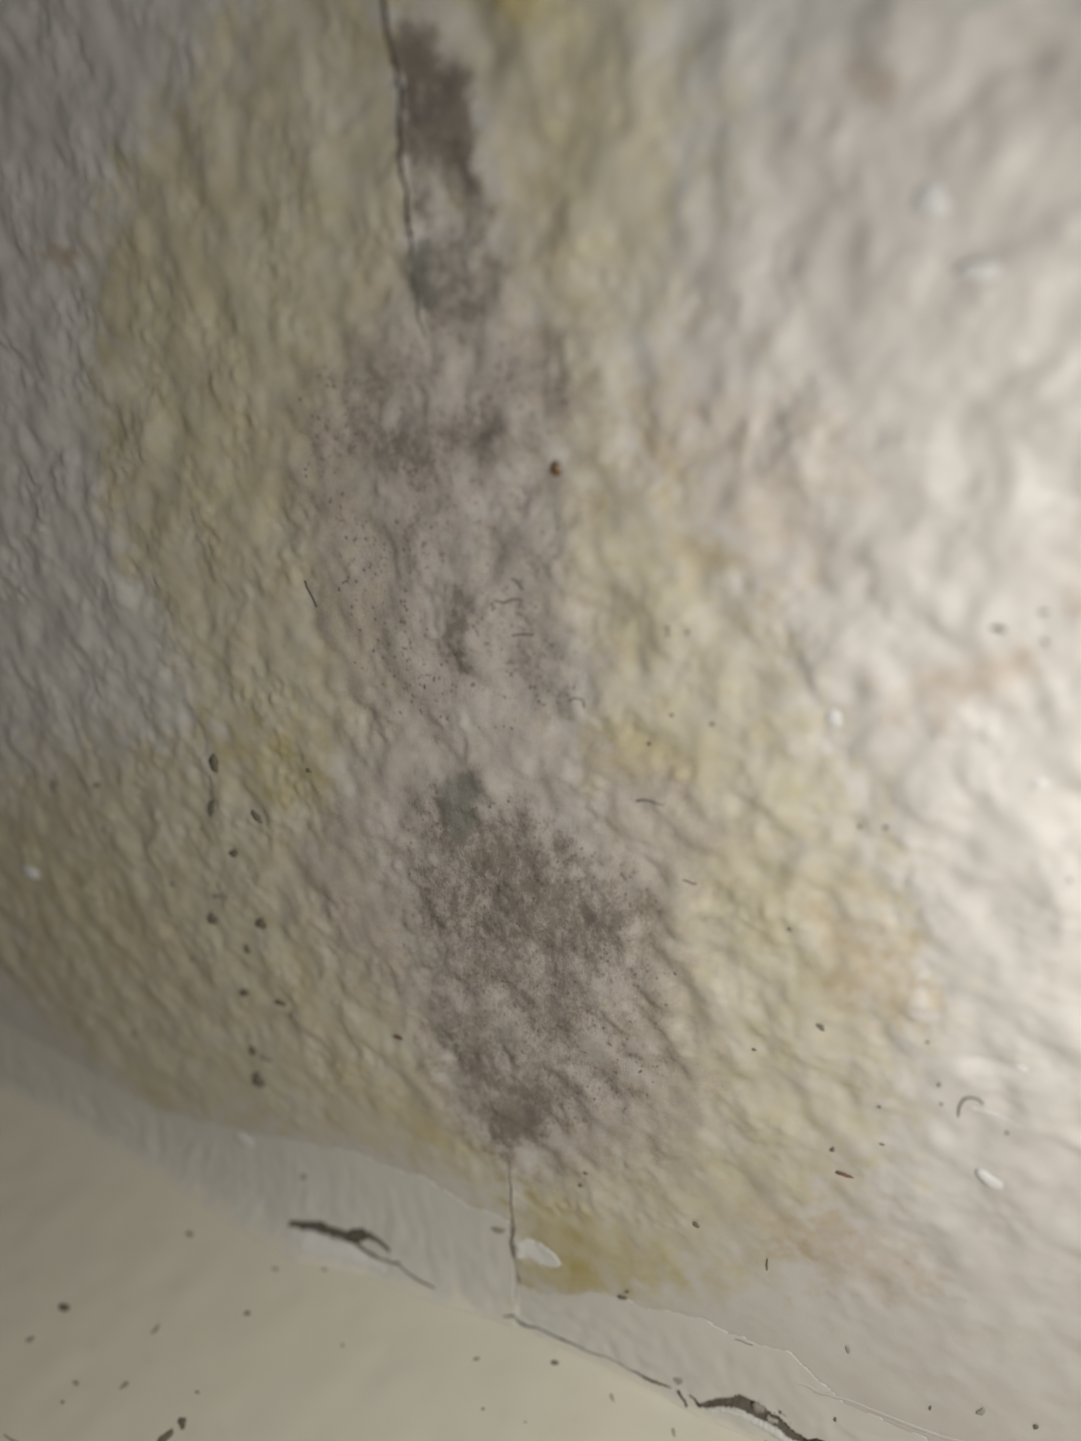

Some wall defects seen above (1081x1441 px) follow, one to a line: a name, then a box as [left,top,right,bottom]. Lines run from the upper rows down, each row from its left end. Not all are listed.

crack [381,0,427,339]
leakage [299,6,708,1165]
crack [503,1153,702,1408]